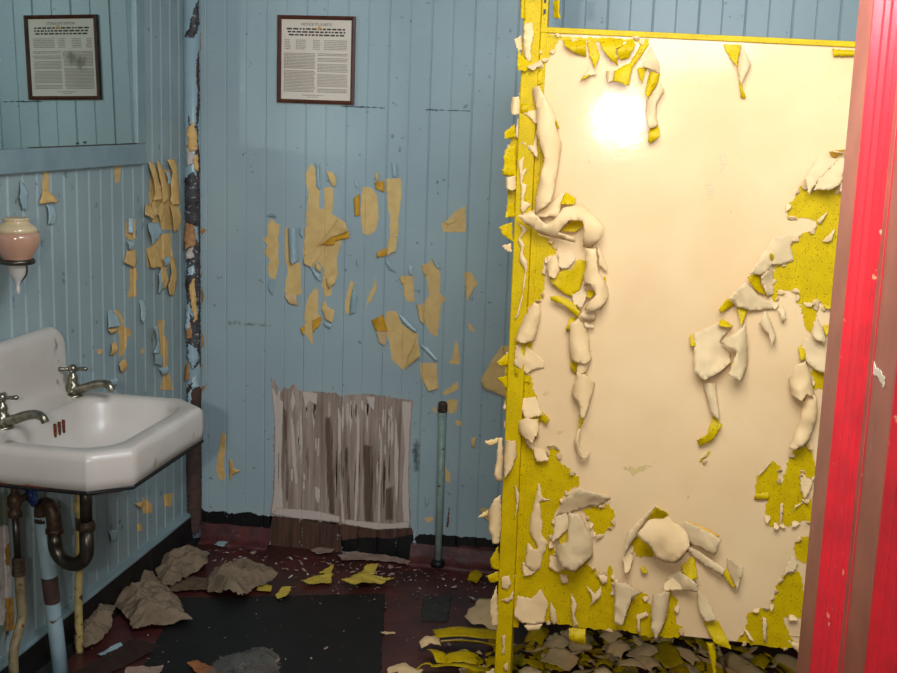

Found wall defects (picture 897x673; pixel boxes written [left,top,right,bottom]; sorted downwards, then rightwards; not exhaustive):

peeling [832,48,855,57]
peeling [97,309,131,386]
peeling [124,0,206,404]
peeling [263,163,377,345]
peeling [354,163,462,426]
peeling [441,207,466,232]
peeling [459,0,845,673]
peeling [270,377,414,552]
peeling [0,525,12,625]